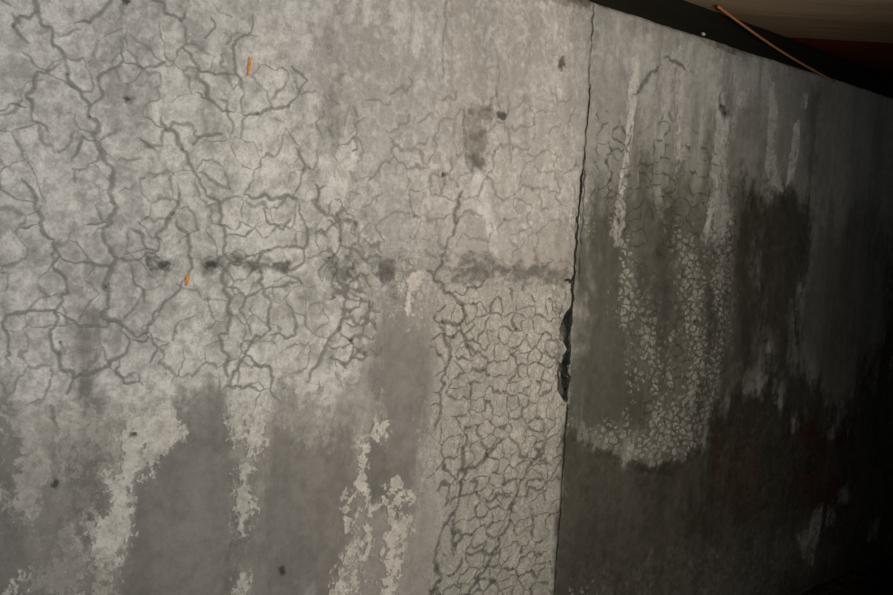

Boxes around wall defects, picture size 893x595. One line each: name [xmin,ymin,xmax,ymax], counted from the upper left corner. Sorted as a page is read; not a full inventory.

crack [2,0,194,393]
crack [184,19,309,115]
crack [141,119,393,398]
water stain [0,0,575,595]
crack [554,2,594,595]
water stain [533,1,759,239]
water stain [420,58,893,595]